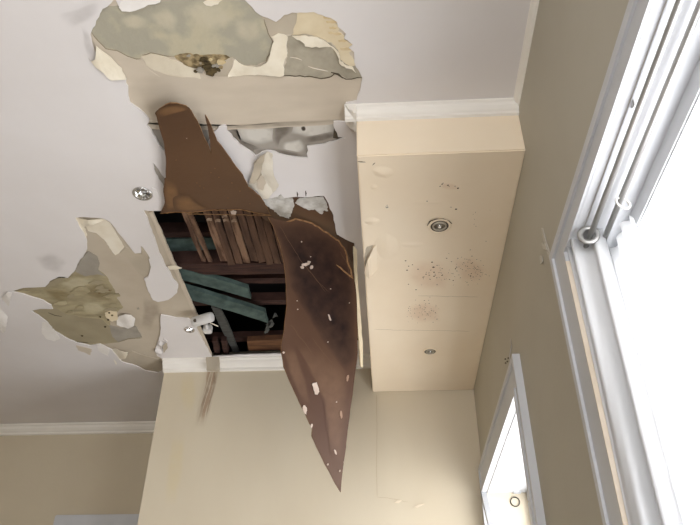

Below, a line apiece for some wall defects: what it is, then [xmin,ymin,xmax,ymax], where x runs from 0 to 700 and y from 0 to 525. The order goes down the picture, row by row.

flaking render [90,0,362,150]
flaking render [0,210,198,372]
leakage [404,255,488,324]
leakage [178,356,220,428]